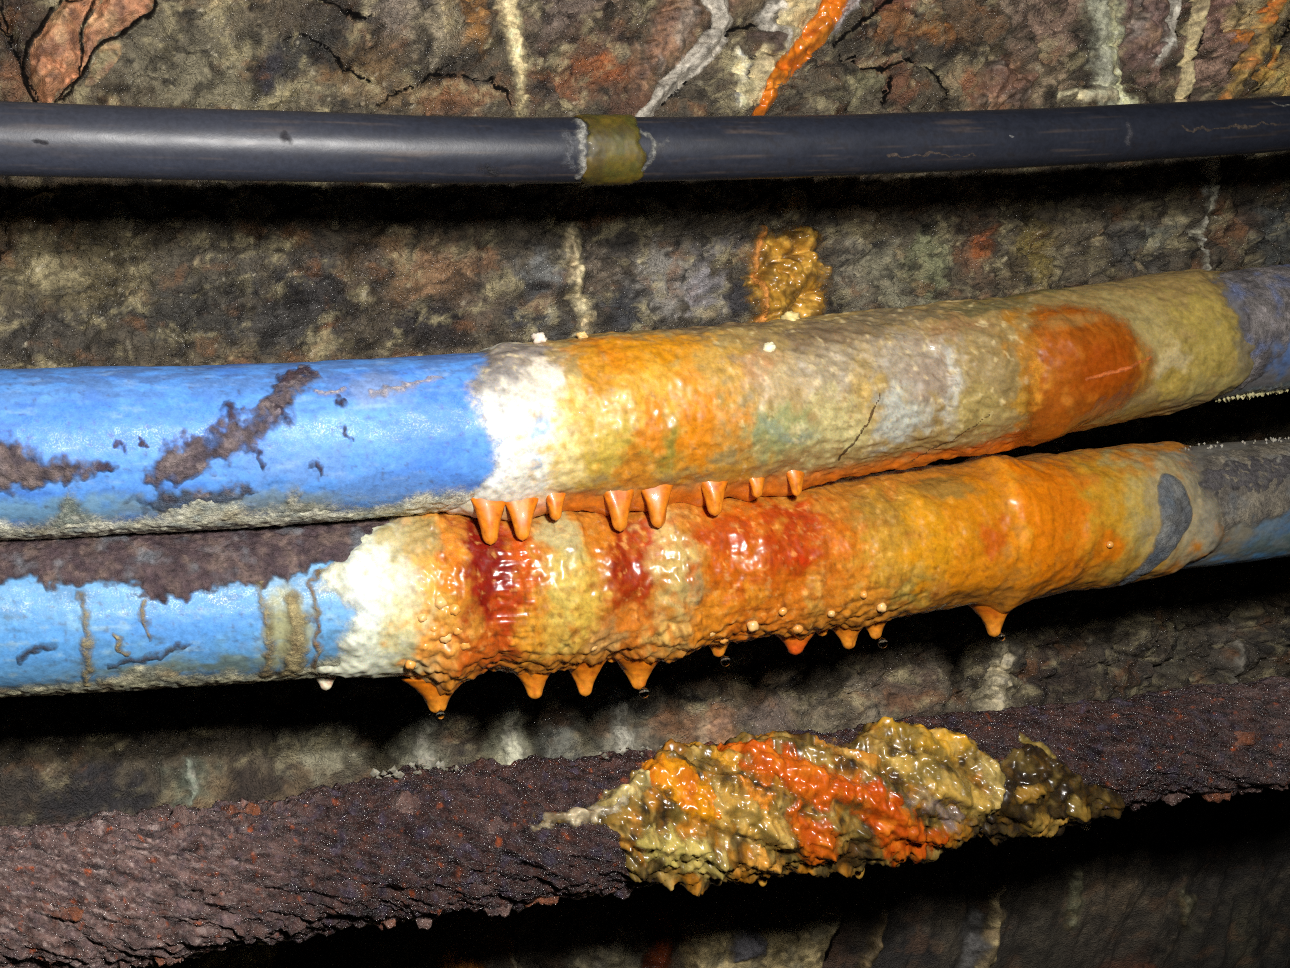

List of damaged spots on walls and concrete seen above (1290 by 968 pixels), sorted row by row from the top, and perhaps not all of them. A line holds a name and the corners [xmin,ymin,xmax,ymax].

damp [635,0,733,117]
rust [746,225,831,323]